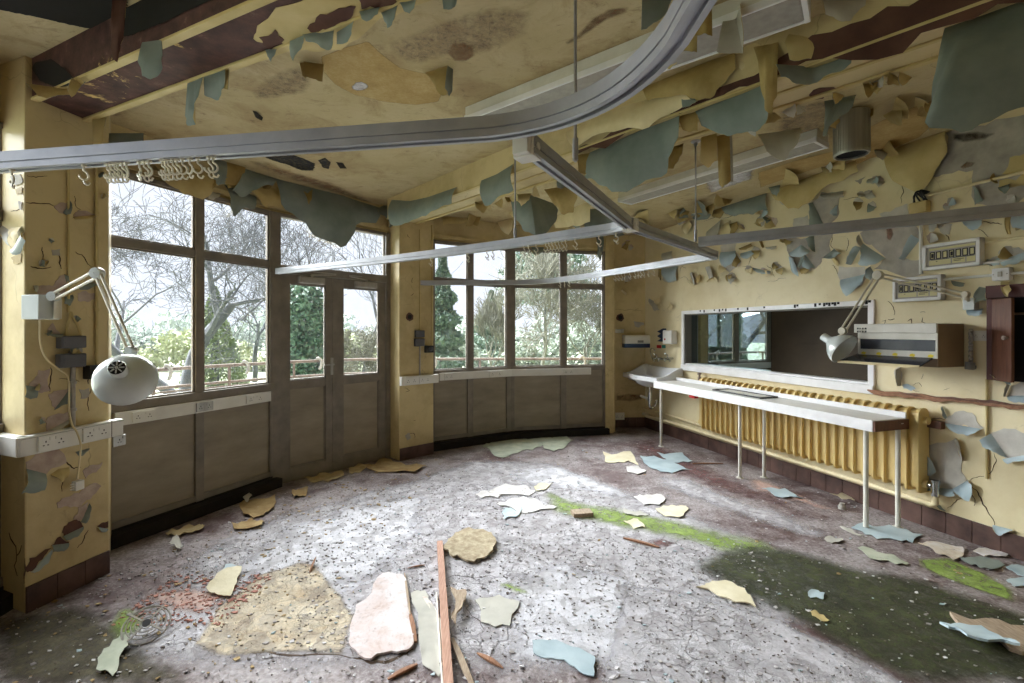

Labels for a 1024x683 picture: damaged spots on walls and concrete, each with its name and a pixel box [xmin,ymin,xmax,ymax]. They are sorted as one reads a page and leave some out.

spalling [0,0,128,63]
peeling [253,0,416,82]
peeling [92,118,144,144]
peeling [185,69,229,126]
peeling [566,0,1024,297]
peeling [0,225,26,264]
peeling [34,238,97,323]
peeling [154,160,634,260]
peeling [25,367,91,431]
peeling [991,375,1024,403]
flaking render [927,406,1024,511]
peeling [21,448,108,573]